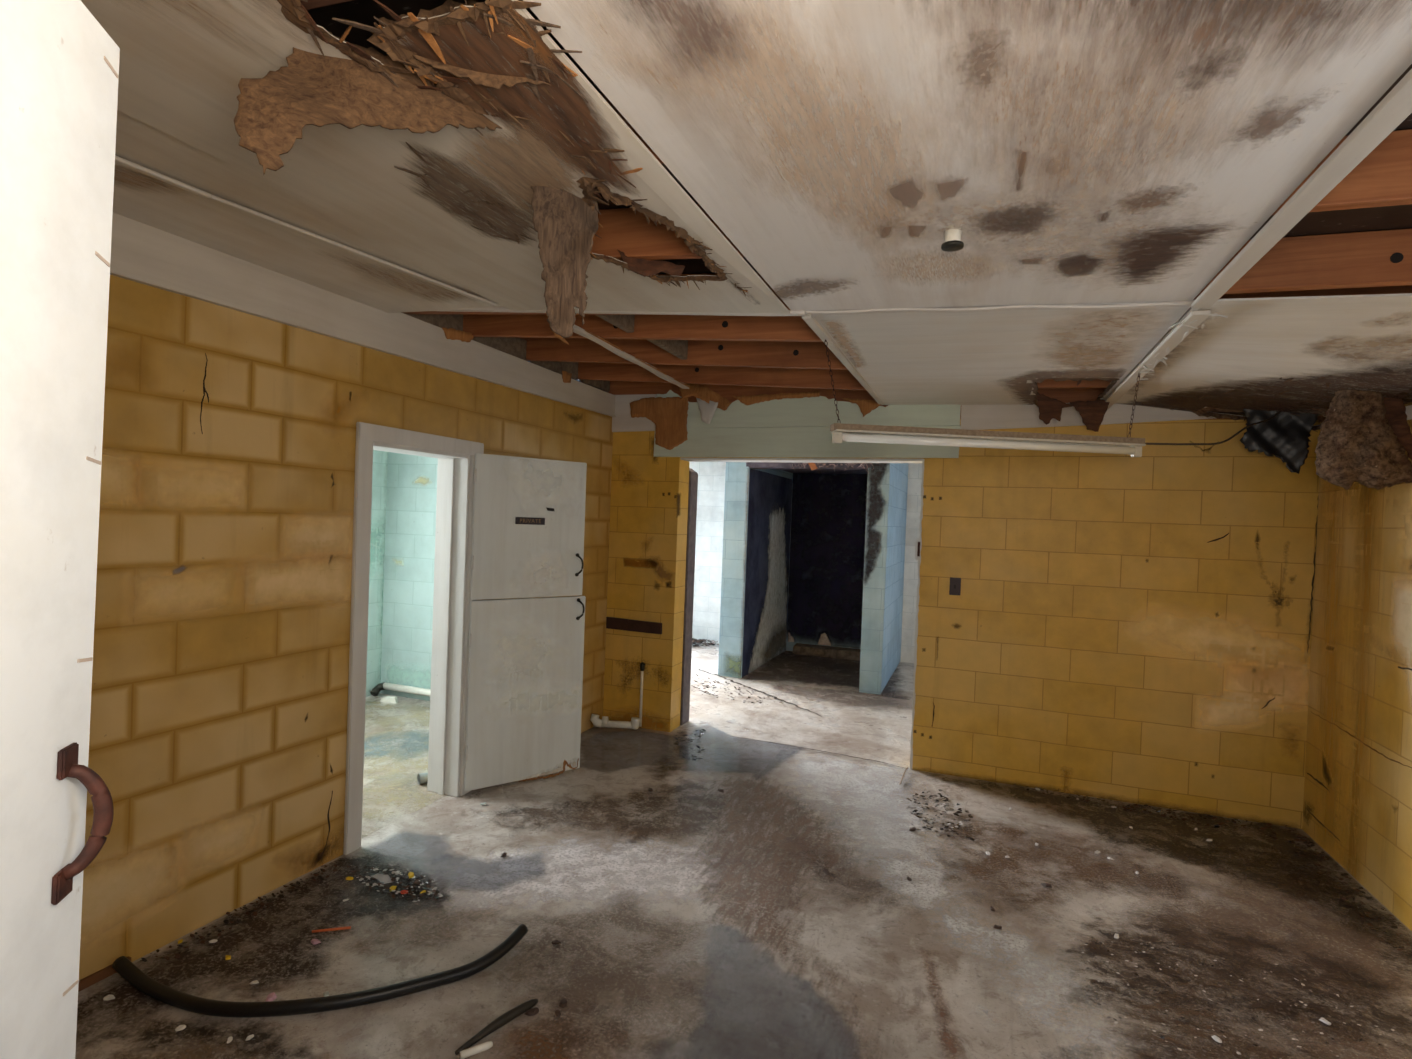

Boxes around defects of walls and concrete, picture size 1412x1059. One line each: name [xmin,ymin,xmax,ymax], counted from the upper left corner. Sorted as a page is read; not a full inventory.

peeling [307,0,656,244]
leakage [631,0,964,238]
leakage [968,0,1397,234]
peeling [653,226,752,296]
leakage [1021,228,1230,285]
crack [200,353,209,434]
leakage [1127,338,1412,421]